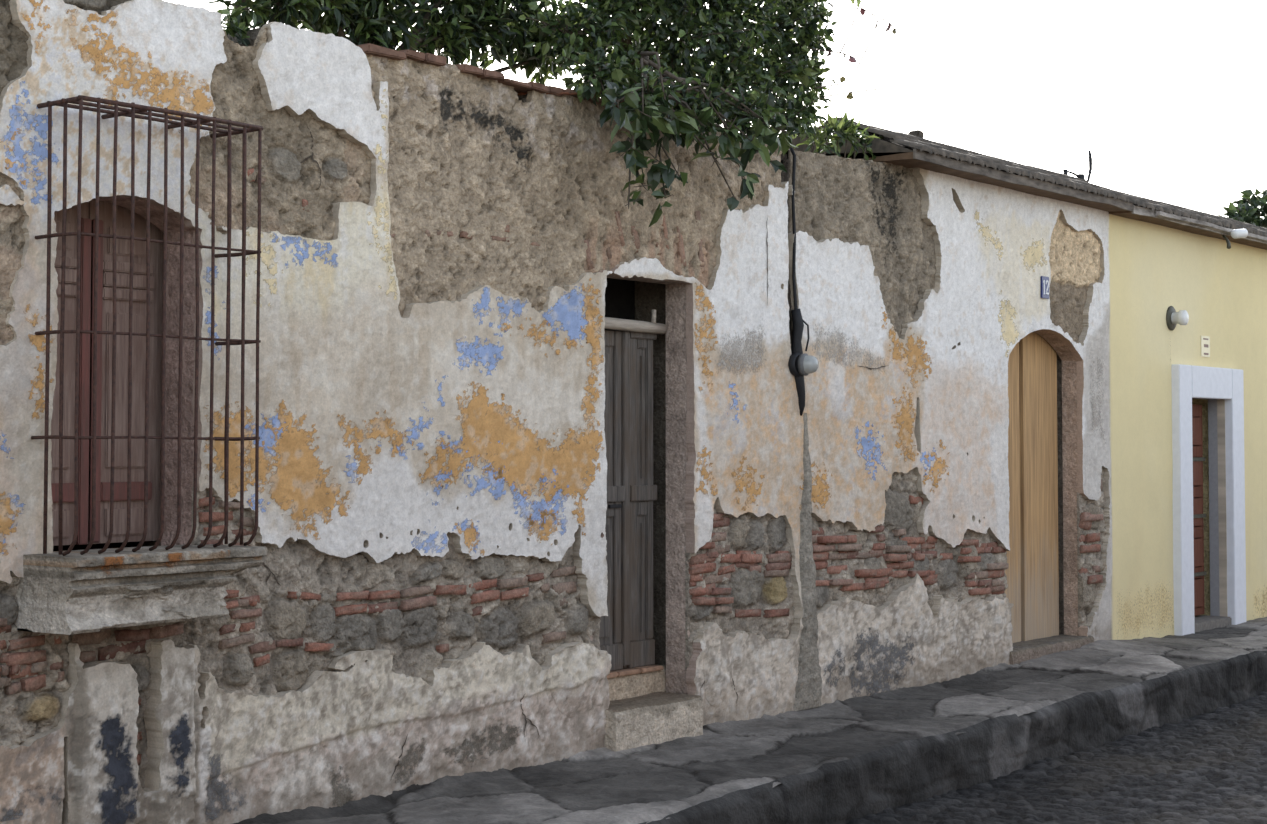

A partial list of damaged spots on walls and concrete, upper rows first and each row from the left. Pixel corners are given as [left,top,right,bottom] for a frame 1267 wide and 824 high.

peeling [998,290,1019,357]
spalling [1020,211,1102,343]
spalling [0,0,1009,789]
spalling [1077,468,1107,627]
damp [98,714,138,824]
damp [169,714,192,795]